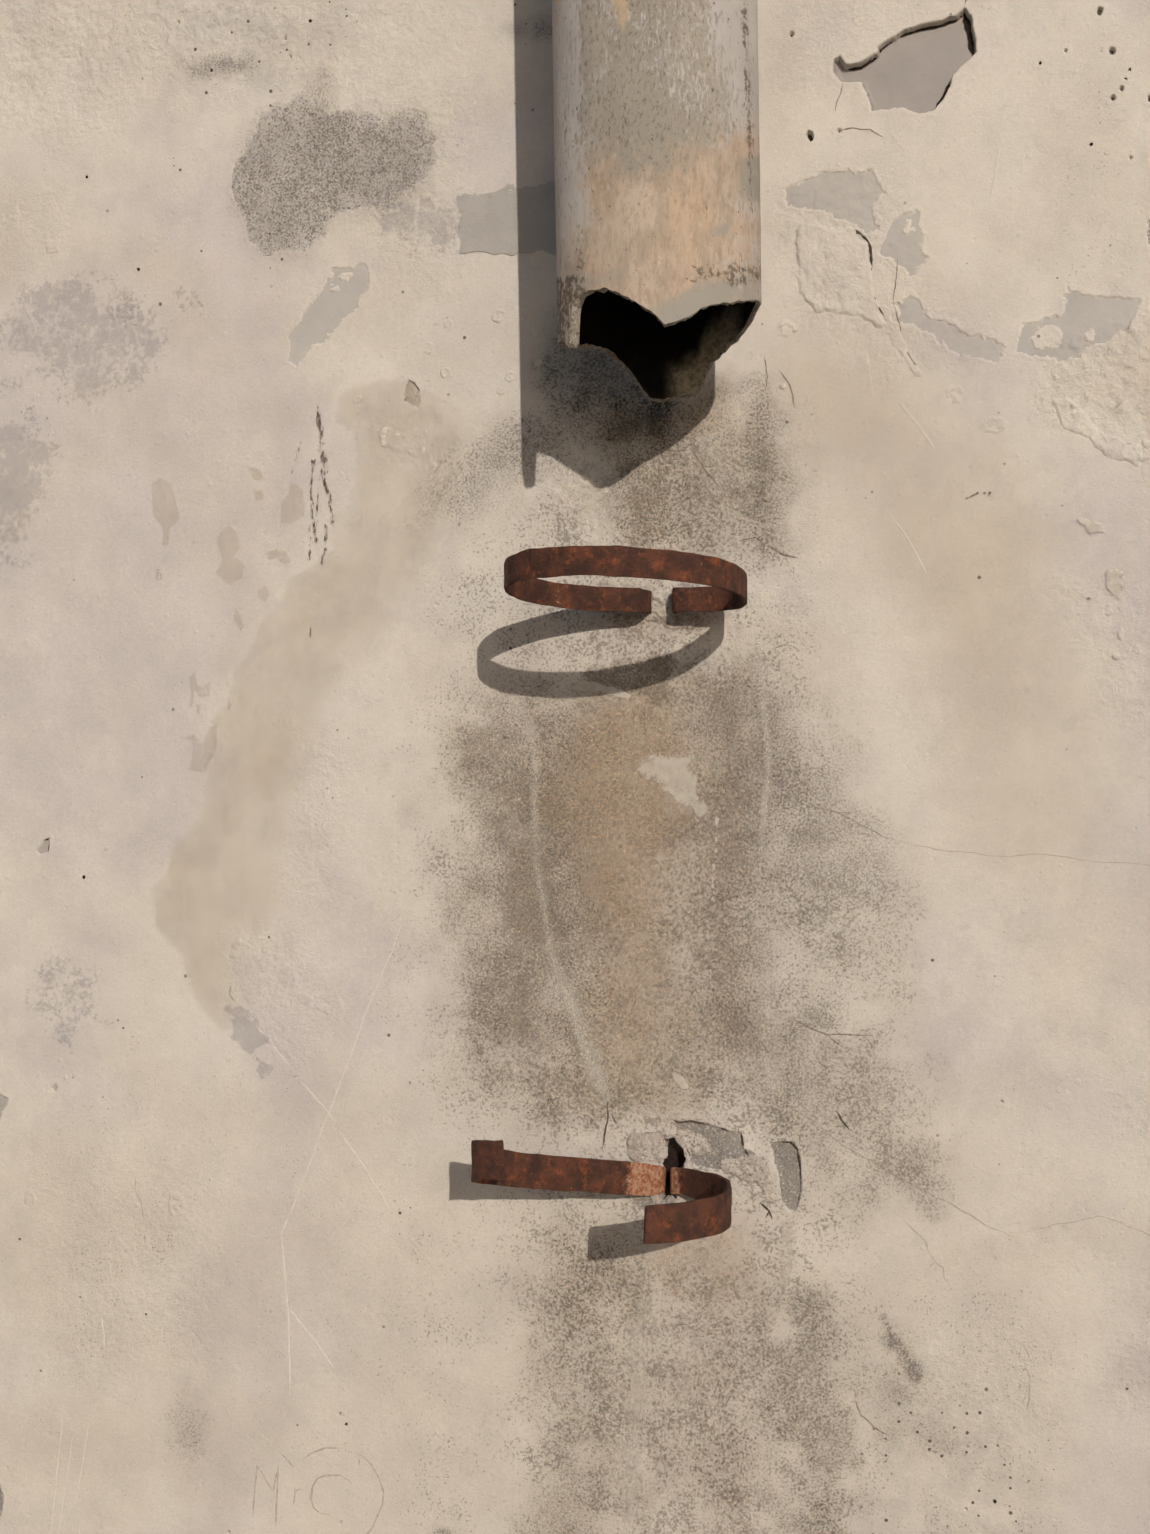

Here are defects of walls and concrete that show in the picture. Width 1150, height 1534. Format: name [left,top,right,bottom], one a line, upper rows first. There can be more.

spalling [225,88,444,264]
spalling [800,123,847,146]
spalling [826,1,982,119]
spalling [1101,41,1150,107]
peeling [282,257,374,370]
peeling [778,162,1146,368]
damp [439,327,773,546]
damp [461,726,584,1050]
damp [774,757,869,963]
spalling [656,1114,807,1218]
damp [780,1046,926,1184]
damp [769,1297,847,1468]